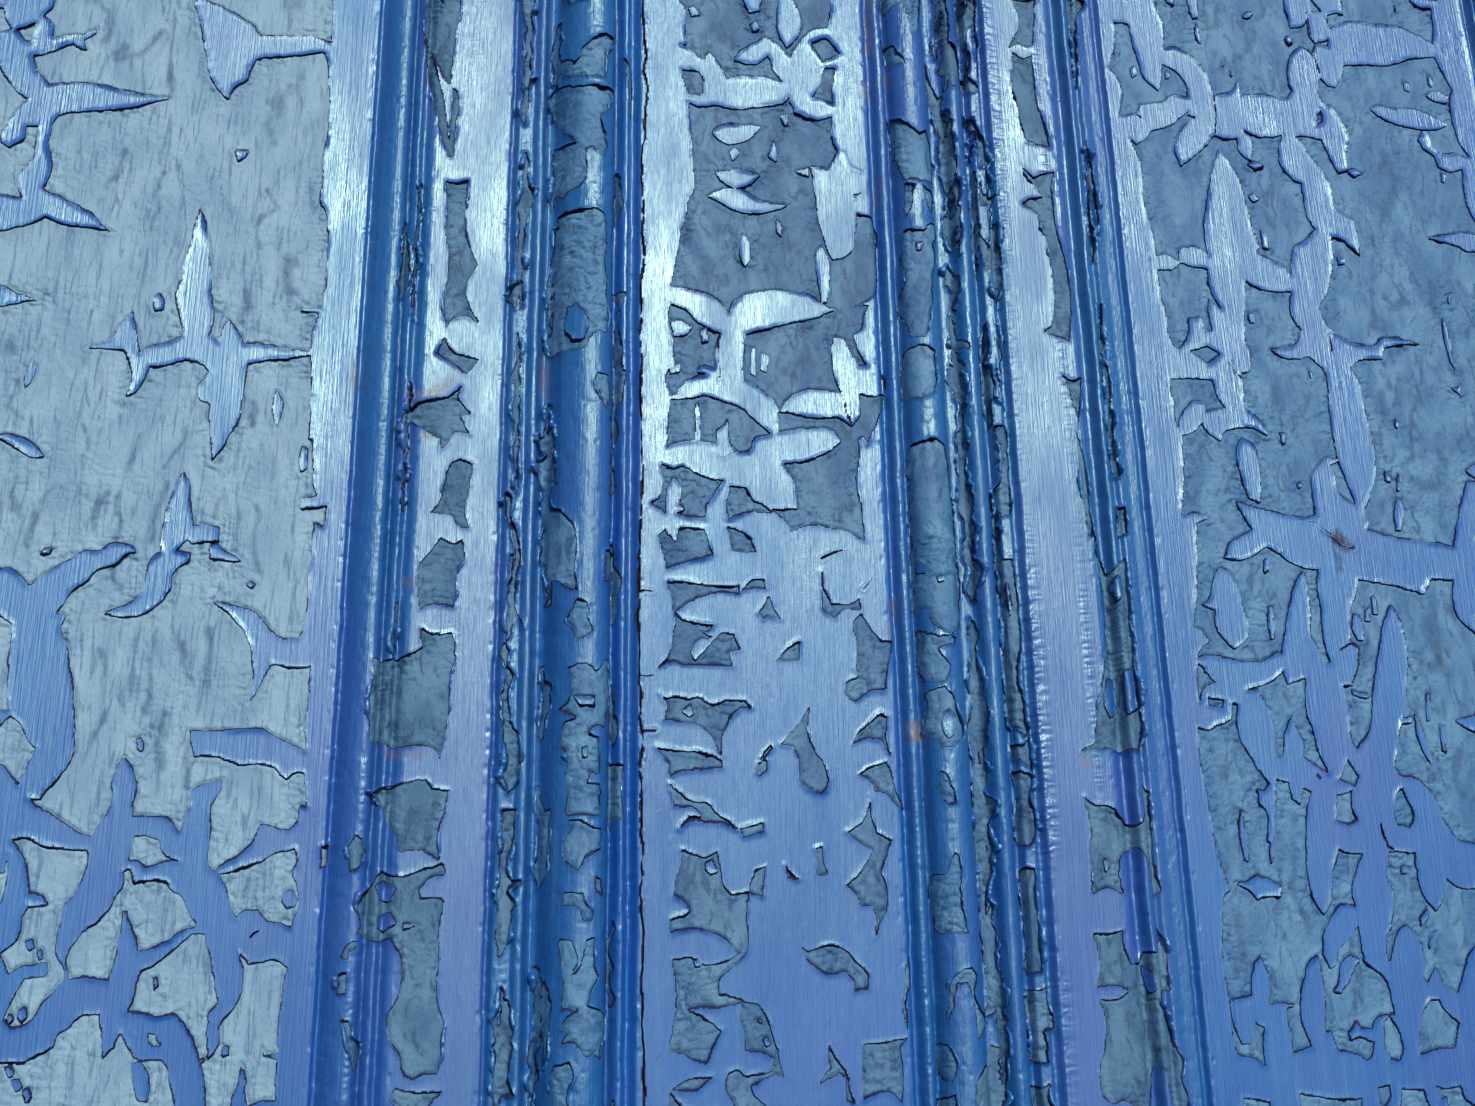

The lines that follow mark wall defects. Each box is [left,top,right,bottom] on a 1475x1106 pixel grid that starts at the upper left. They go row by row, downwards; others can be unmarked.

peeling [0,0,486,1106]
peeling [482,0,638,1106]
peeling [648,0,1104,1106]
peeling [1053,298,1197,1106]
peeling [1101,0,1475,1106]